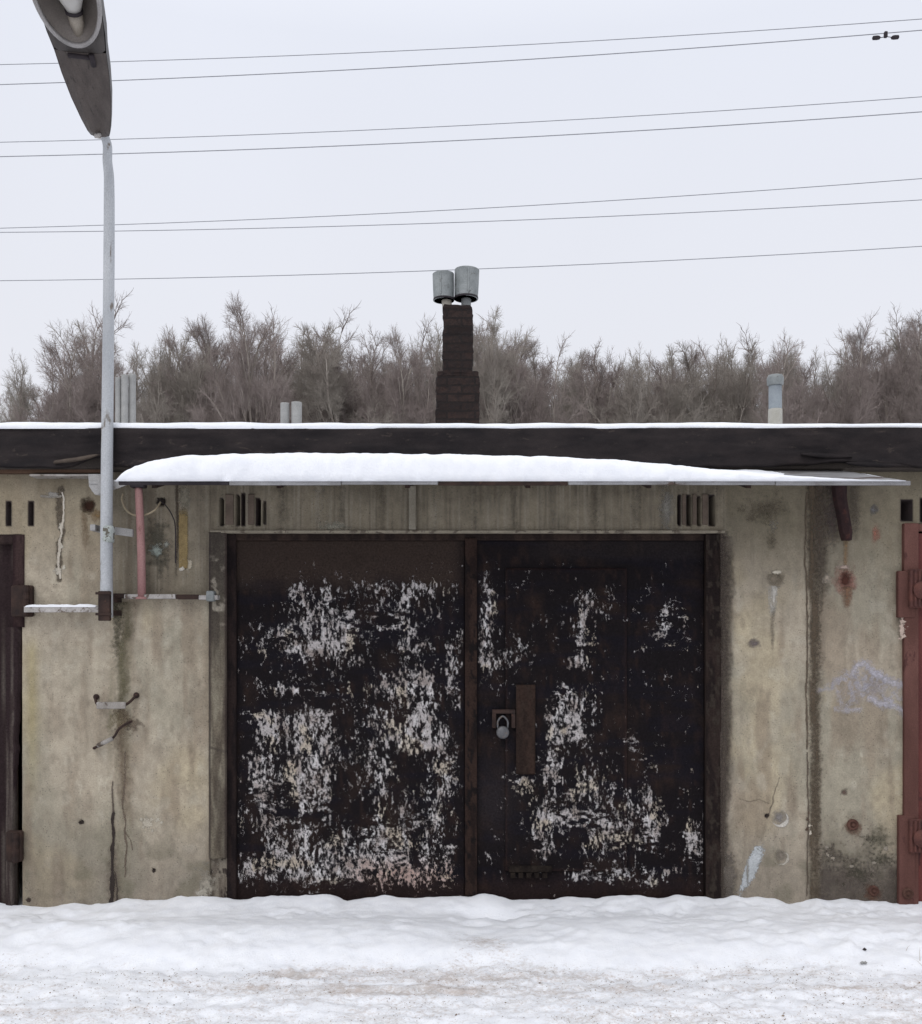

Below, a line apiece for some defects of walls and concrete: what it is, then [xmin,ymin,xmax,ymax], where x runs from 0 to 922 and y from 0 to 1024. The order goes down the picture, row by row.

damp [813,486,838,596]
peeling [478,570,528,676]
peeling [563,589,615,670]
peeling [634,604,688,652]
peeling [238,576,463,894]
peeling [502,683,703,887]
damp [720,531,737,898]